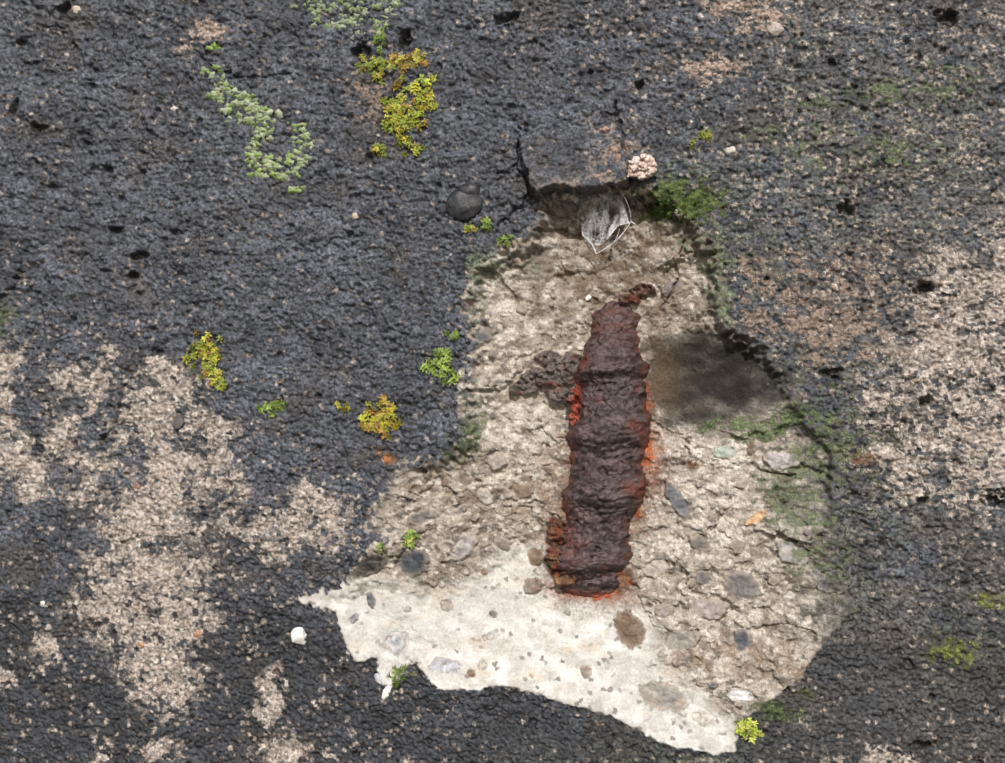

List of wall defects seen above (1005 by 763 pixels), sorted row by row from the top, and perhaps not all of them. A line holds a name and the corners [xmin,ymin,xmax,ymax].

crack [496,136,533,228]
spalling [831,197,866,223]
spalling [299,90,858,755]
corrosion [630,383,702,535]
corrosion [546,512,636,603]